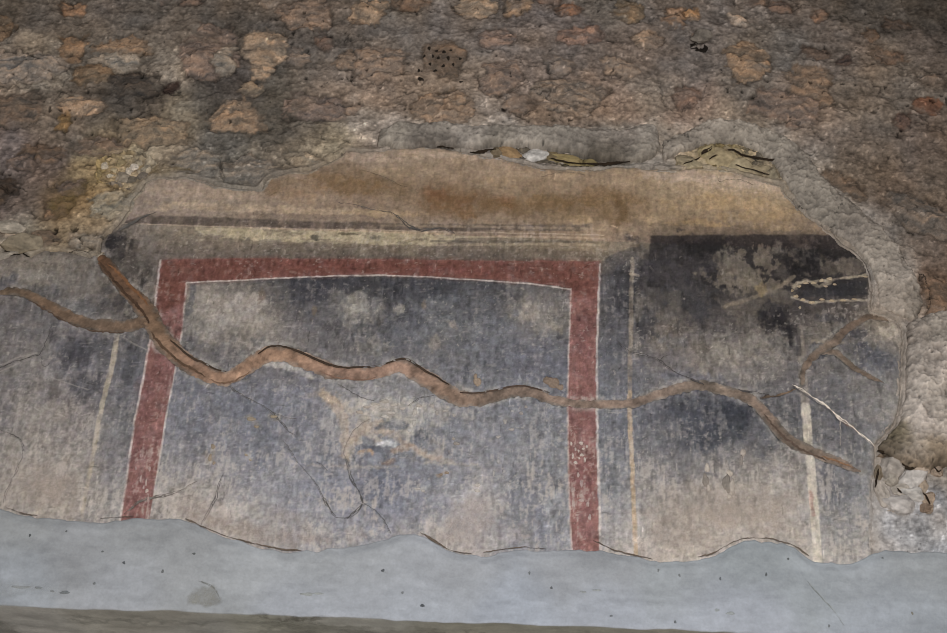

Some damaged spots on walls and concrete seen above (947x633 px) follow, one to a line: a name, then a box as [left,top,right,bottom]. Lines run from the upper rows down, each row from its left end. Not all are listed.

spalling [674,143,781,179]
crack [117,213,153,232]
crack [0,250,888,534]
spalling [873,450,943,516]
crack [100,475,302,551]
crack [420,532,544,554]
crack [593,540,653,560]
crack [698,537,809,557]